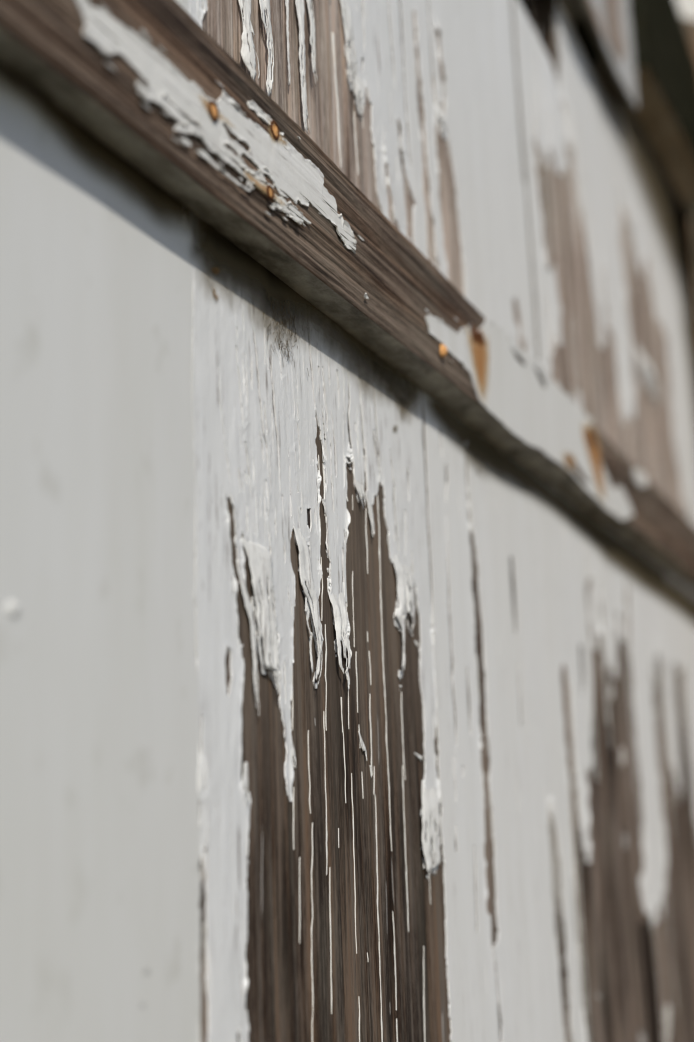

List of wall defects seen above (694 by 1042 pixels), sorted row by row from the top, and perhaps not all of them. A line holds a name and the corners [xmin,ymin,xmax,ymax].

corrosion [203,99,220,122]
peeling [75,0,466,296]
corrosion [270,120,284,142]
peeling [425,101,690,521]
peeling [199,848,208,1042]
peeling [225,415,450,1042]
peeling [465,451,501,1042]
peeling [548,559,694,1042]